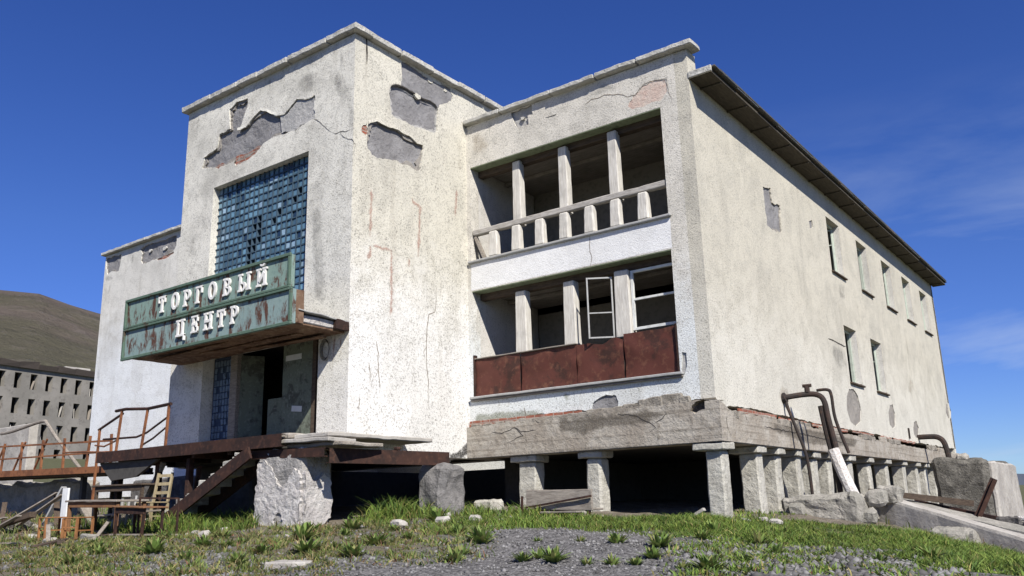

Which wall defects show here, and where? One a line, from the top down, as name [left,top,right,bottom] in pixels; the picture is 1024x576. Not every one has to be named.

crack [586,78,673,104]
flaking render [628,80,667,109]
flaking render [203,93,315,169]
flaking render [361,62,452,171]
flaking render [763,188,781,232]
flaking render [141,236,177,264]
crack [424,288,437,409]
crack [493,407,538,444]
spalling [469,392,706,427]